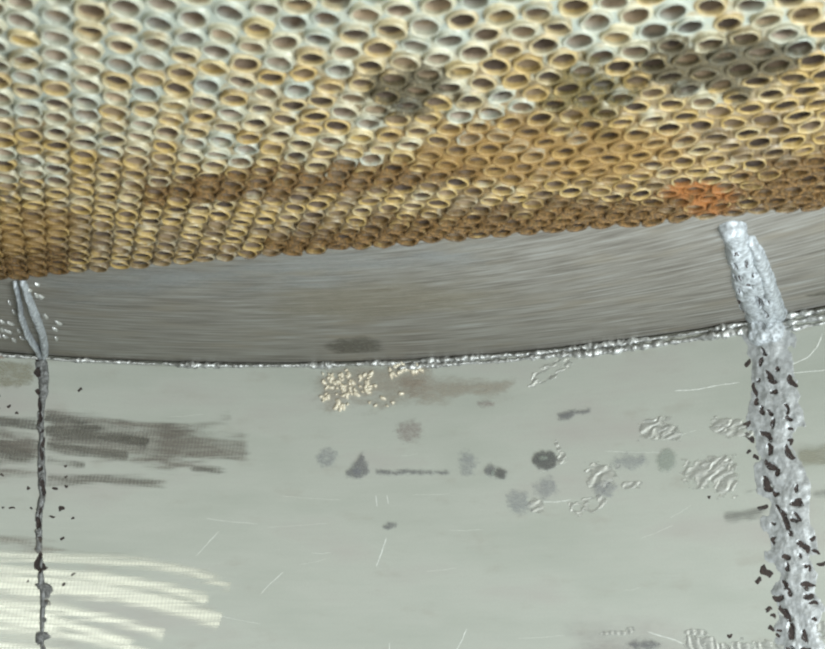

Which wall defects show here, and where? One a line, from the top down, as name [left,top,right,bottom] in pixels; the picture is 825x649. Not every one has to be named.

damp [363,63,459,121]
corrosion [242,142,825,259]